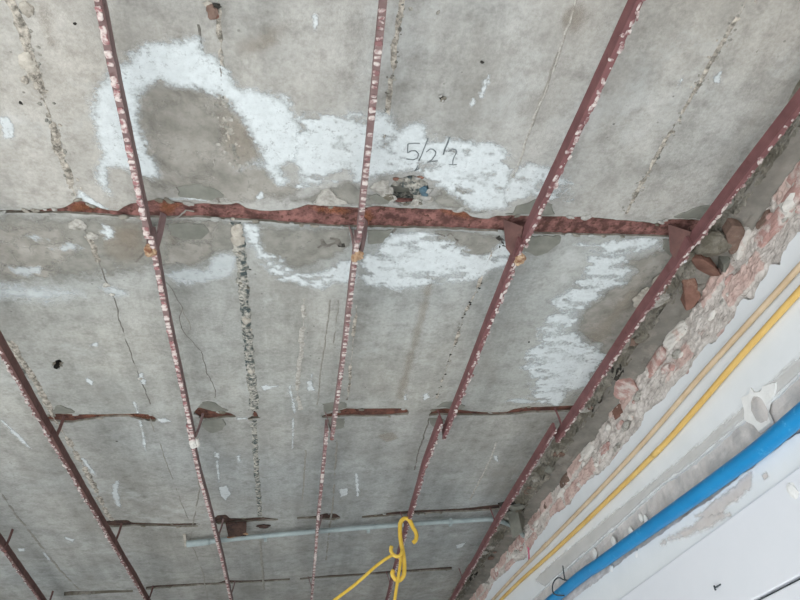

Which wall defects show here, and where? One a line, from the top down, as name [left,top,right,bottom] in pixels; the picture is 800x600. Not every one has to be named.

efflorescence [91,76,130,192]
spalling [0,197,357,255]
leakage [119,35,550,212]
leakage [244,222,510,290]
spalling [708,114,800,232]
crack [68,219,188,518]
crack [166,282,216,397]
peeling [353,161,800,600]
leakage [511,238,672,406]